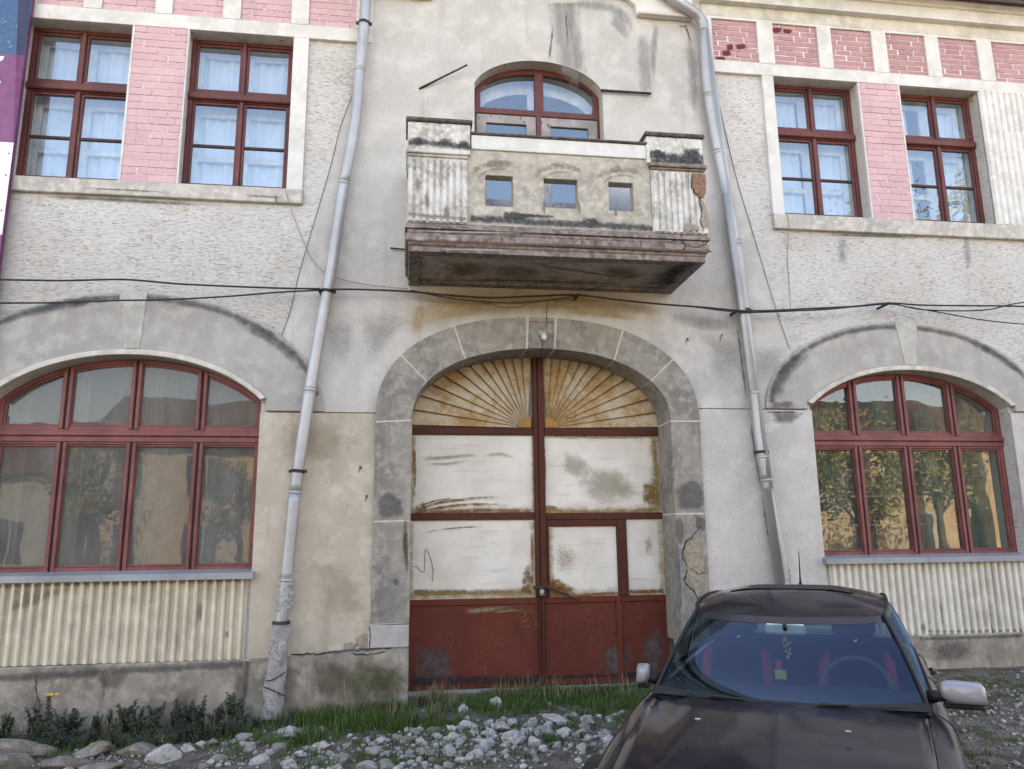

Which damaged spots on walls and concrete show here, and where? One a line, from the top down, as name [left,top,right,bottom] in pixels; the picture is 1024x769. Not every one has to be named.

leakage [408,137,471,150]
leakage [650,149,704,165]
flaking render [683,172,709,231]
crack [290,627,391,656]